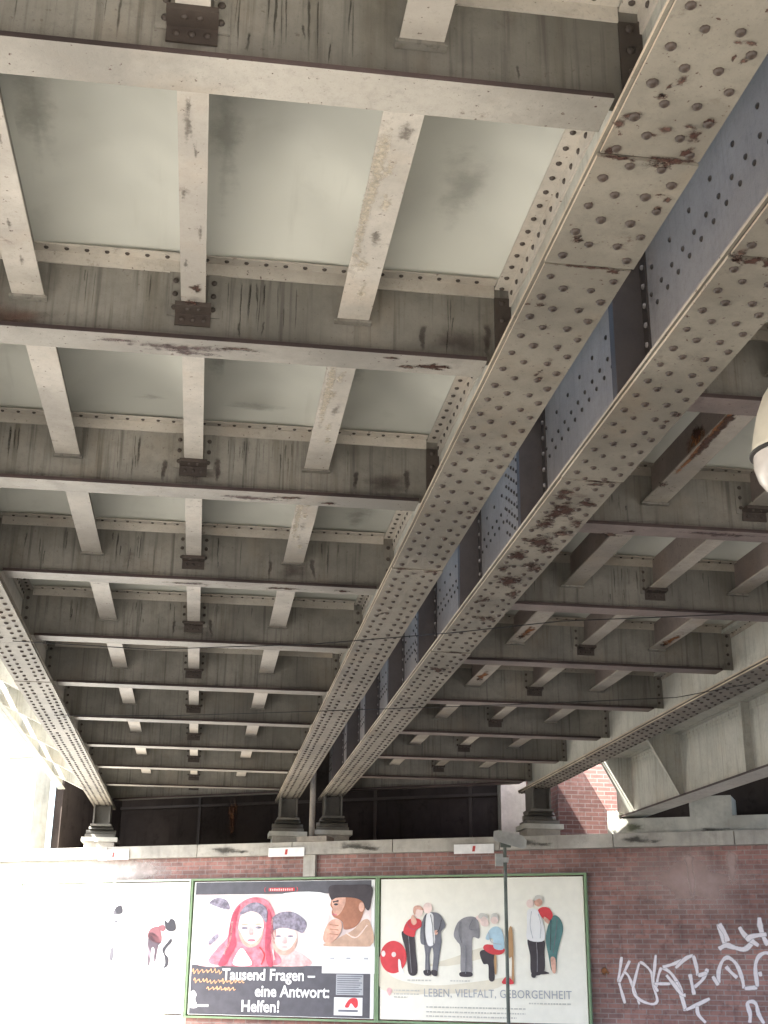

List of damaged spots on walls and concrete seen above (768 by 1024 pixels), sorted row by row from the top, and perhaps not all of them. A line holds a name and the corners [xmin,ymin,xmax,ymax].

rust [604,147,634,162]
rust [649,119,714,168]
rust [732,250,768,267]
rust [101,338,256,356]
rust [676,414,735,473]
rust [497,480,616,598]